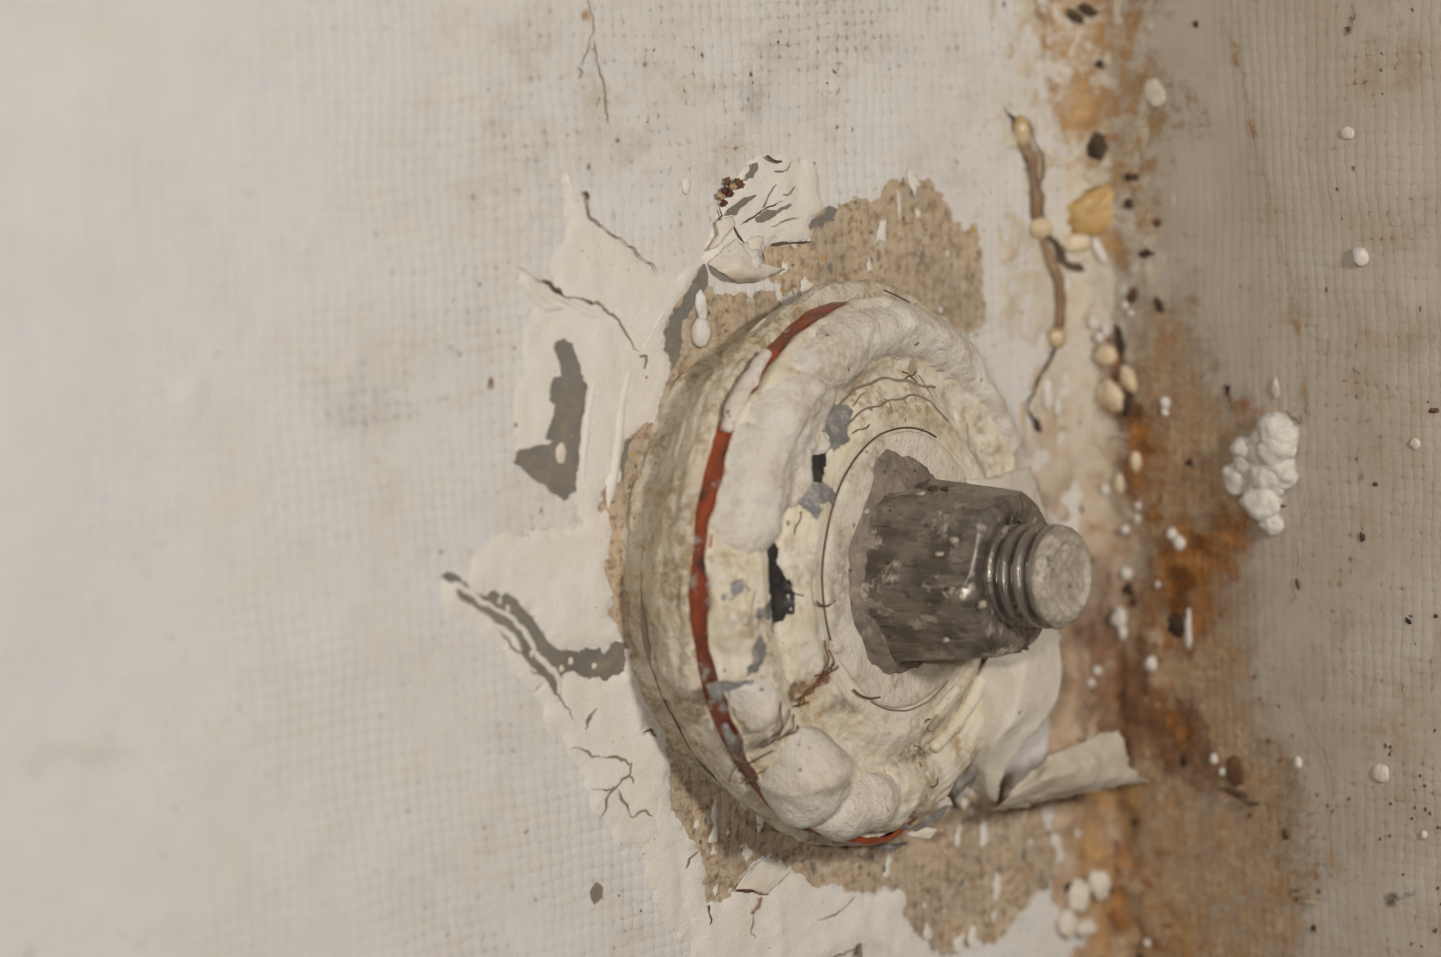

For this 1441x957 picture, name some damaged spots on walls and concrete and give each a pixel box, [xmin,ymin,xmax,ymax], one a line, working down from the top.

peeling [1086,131,1109,161]
corrosion [1034,0,1190,271]
peeling [1090,237,1108,264]
peeling [440,168,987,707]
peeling [1114,324,1126,357]
peeling [1121,391,1133,418]
corrosion [1075,336,1250,789]
peeling [590,882,603,904]
peeling [657,720,1073,956]
corrosion [1070,784,1143,957]